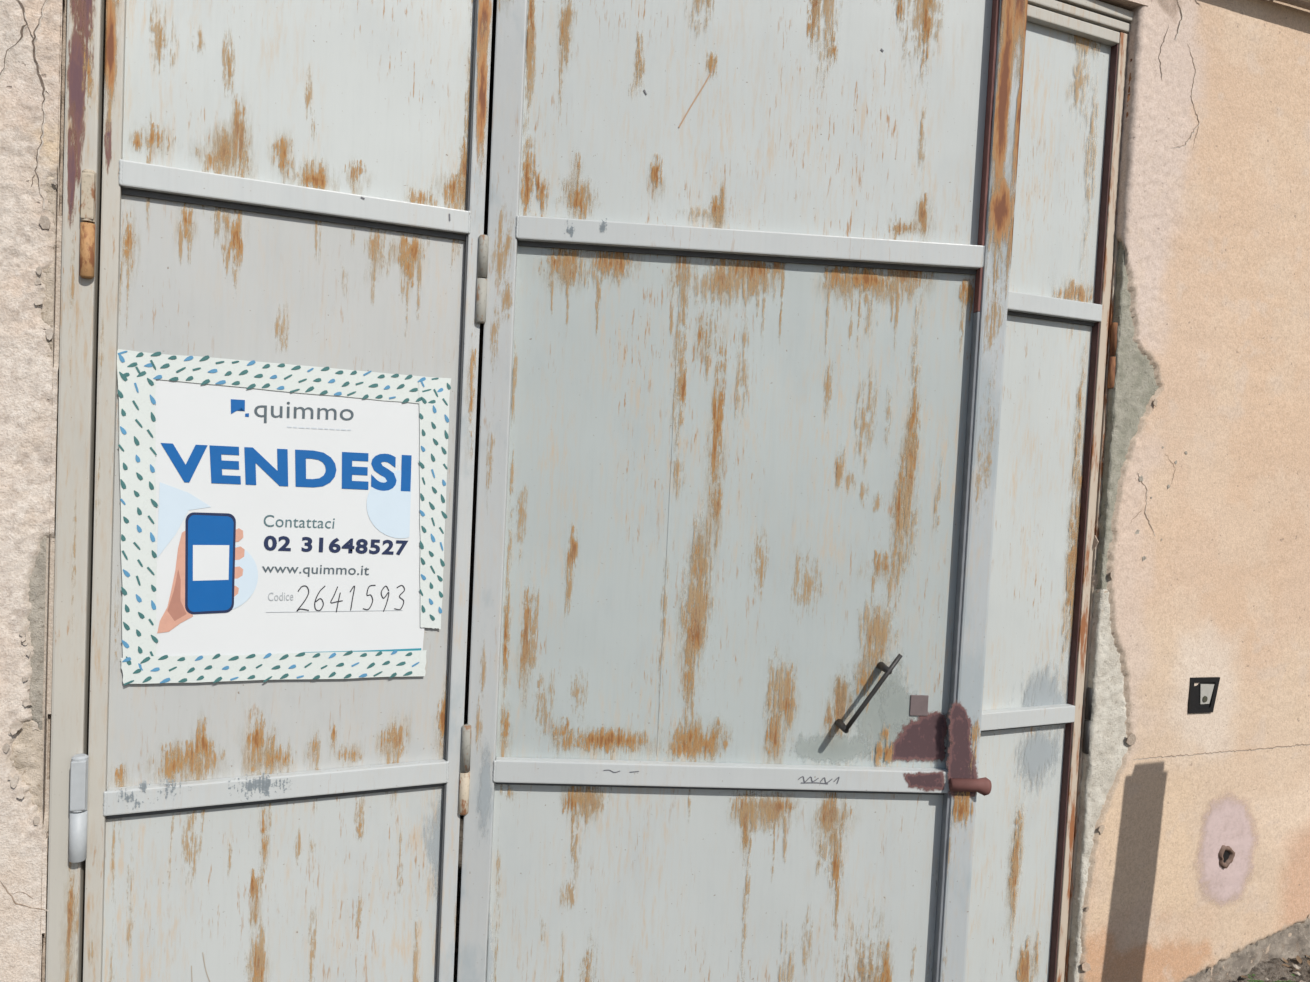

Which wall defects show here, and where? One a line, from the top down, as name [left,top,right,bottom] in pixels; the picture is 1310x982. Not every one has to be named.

crack [0,0,49,209]
corrosion [67,0,119,227]
corrosion [409,0,500,210]
corrosion [521,0,592,219]
corrosion [959,0,1028,352]
crack [1159,0,1202,149]
corrosion [501,450,648,760]
corrosion [660,256,785,762]
corrosion [824,266,933,739]
flaking render [1068,241,1159,982]
corrosion [249,803,271,982]
flaking render [1183,914,1310,982]